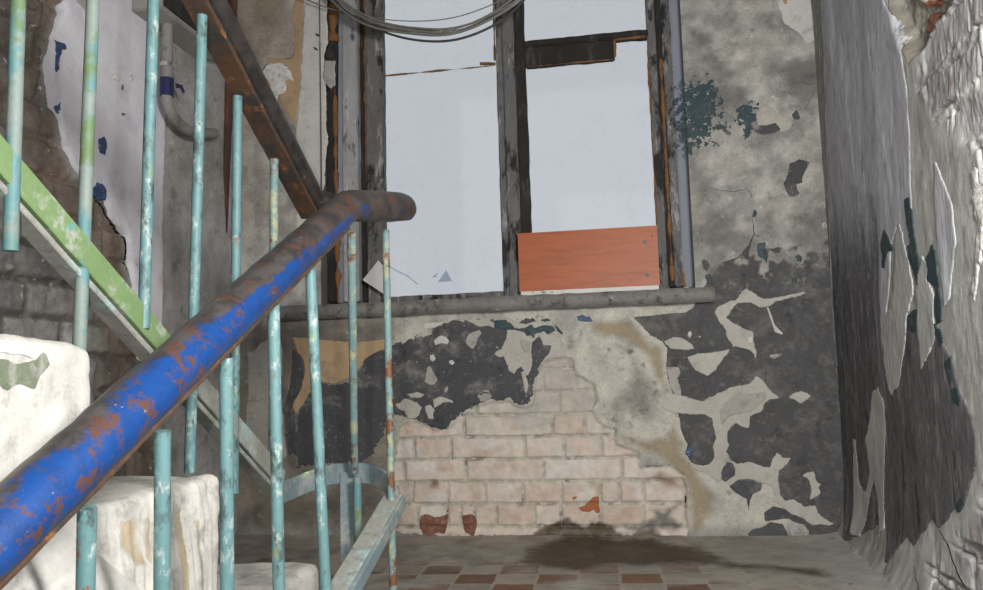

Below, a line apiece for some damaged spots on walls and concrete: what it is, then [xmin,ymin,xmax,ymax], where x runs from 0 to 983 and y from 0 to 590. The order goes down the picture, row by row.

flaking render [42,0,86,174]
flaking render [93,0,147,296]
flaking render [150,31,166,324]
flaking render [263,0,336,190]
flaking render [246,339,269,450]
flaking render [280,0,977,563]
water stain [597,323,662,377]
water stain [641,435,710,529]
crack [939,530,967,588]